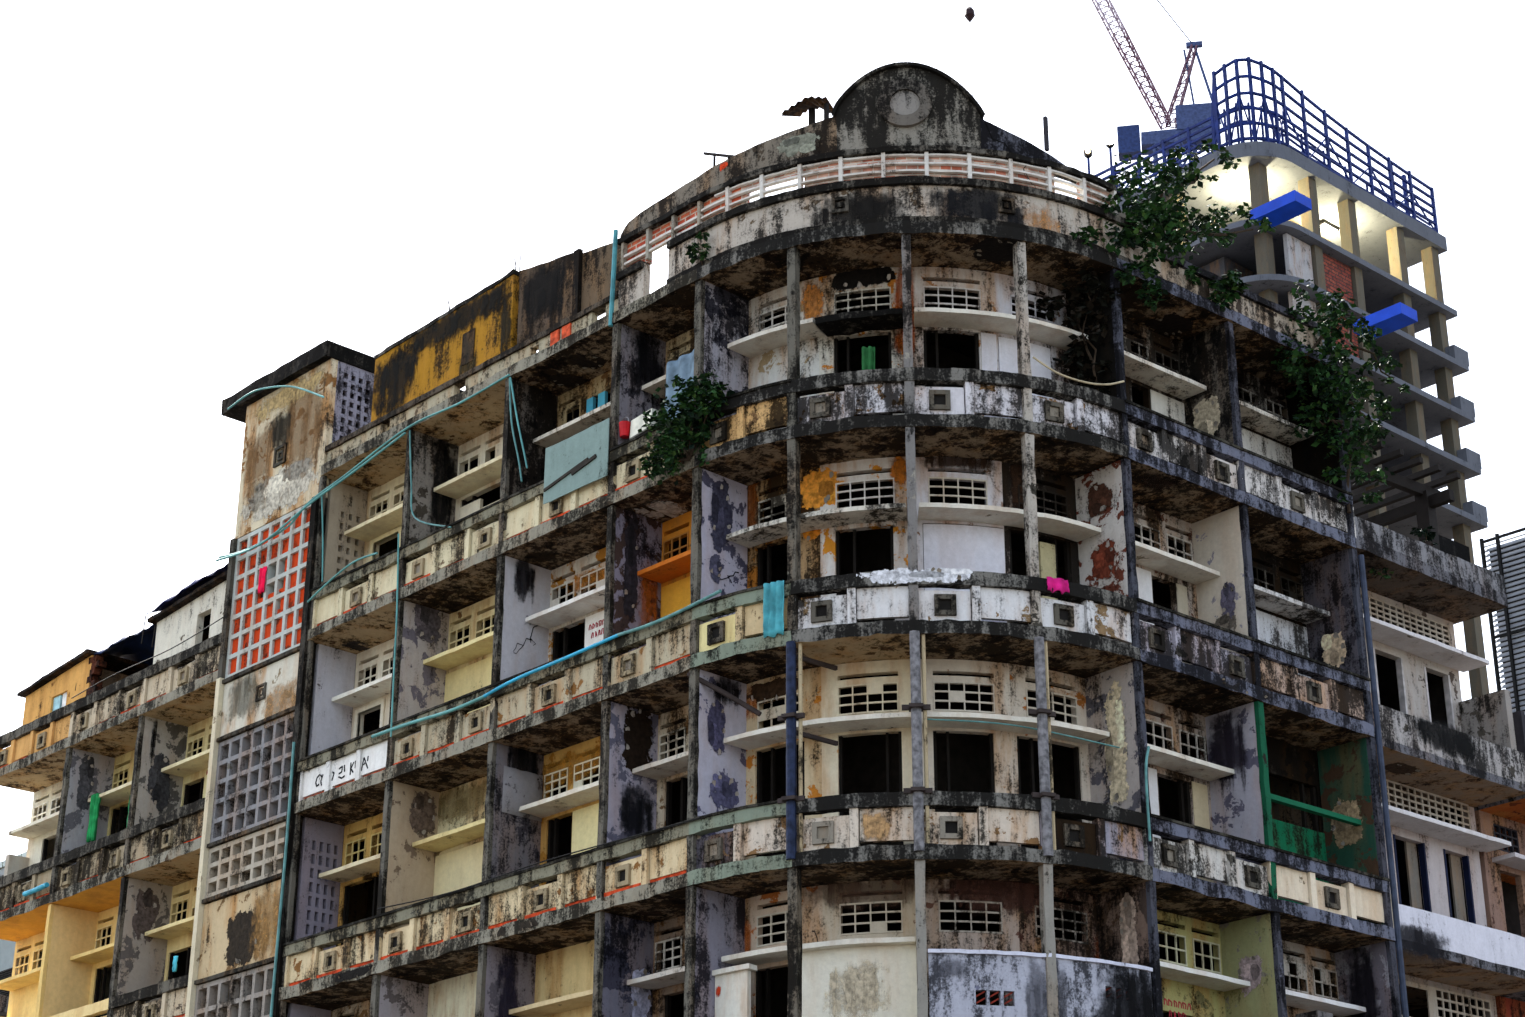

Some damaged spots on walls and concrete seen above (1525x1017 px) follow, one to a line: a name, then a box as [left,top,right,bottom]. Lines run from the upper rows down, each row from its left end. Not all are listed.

water stain [372,258,565,427]
peeling [1193,396,1221,435]
water stain [245,369,323,515]
peeling [800,465,839,510]
peeling [1321,632,1347,668]
water stain [1413,716,1475,760]
water stain [620,786,654,837]
peeling [1331,798,1363,849]